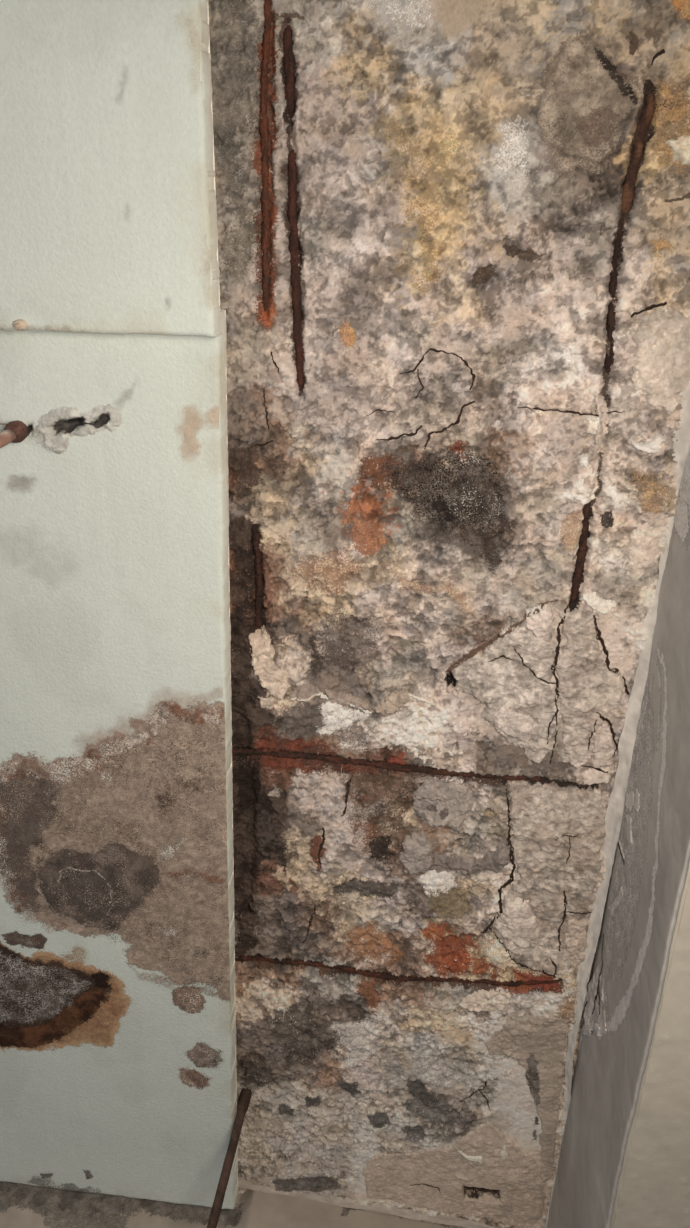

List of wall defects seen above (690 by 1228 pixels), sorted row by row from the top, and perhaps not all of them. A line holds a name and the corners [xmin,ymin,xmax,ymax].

corrosion [251,11,280,331]
spalling [254,0,306,397]
spalling [536,33,690,175]
water stain [228,443,264,499]
crack [367,348,476,449]
water stain [376,441,516,574]
water stain [0,516,265,1051]
corrosion [244,724,410,775]
peeling [241,200,655,1228]
crack [446,599,630,773]
corrosion [417,887,581,1032]
crack [481,788,604,1028]